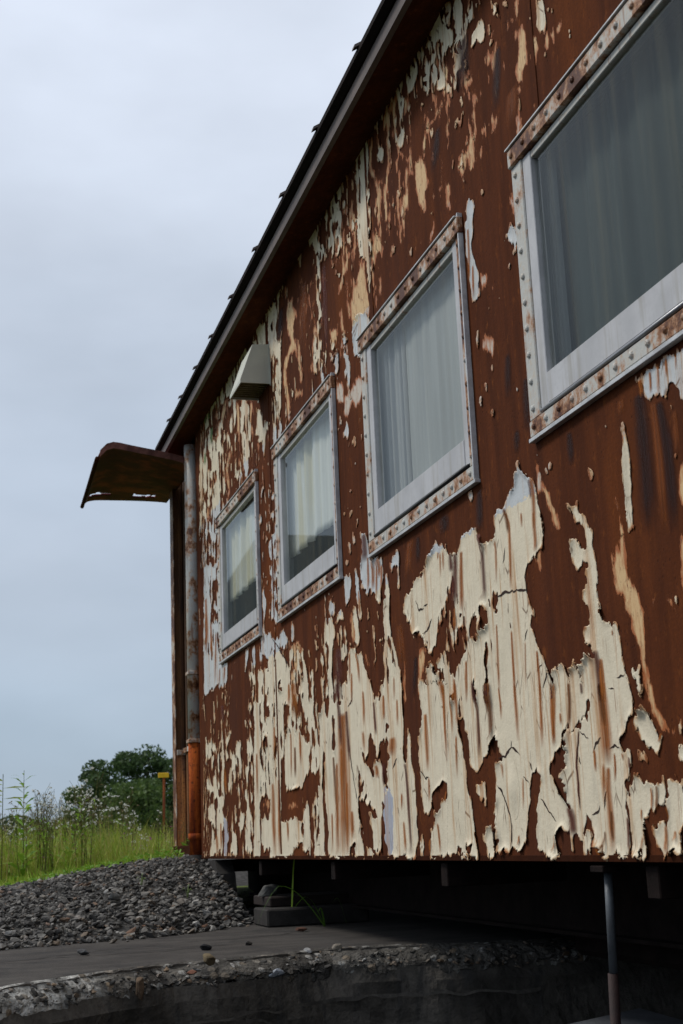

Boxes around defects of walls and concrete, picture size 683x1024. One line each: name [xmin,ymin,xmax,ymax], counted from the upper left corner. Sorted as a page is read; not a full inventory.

peeling [199,0,683,862]
corrosion [476,478,536,592]
corrosion [437,552,463,627]
crack [497,589,527,597]
corrosion [272,784,289,844]
corrosion [290,732,301,771]
corrosion [331,648,398,842]
corrosion [401,764,411,845]
corrosion [438,625,501,764]
corrosion [511,632,582,739]
corrosion [567,739,579,832]
corrosion [593,651,643,855]